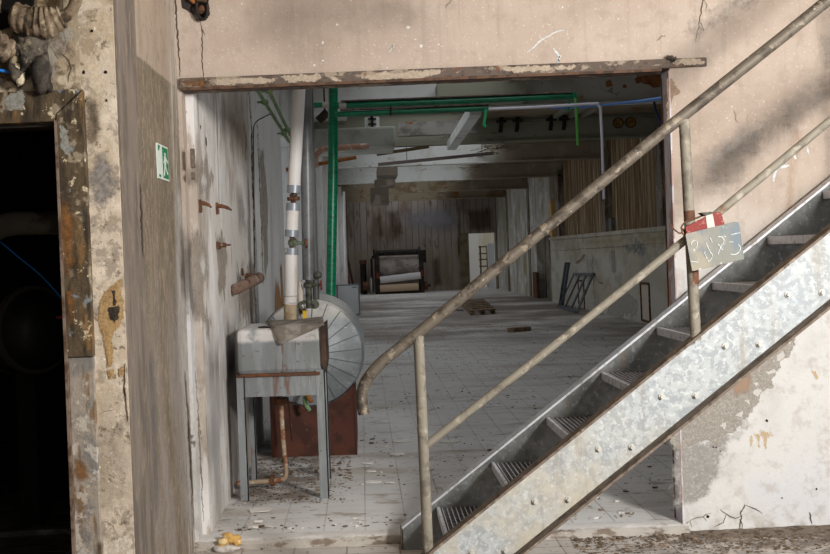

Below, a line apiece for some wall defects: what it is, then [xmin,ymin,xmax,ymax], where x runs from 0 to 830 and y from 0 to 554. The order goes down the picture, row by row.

spalling [98,279,128,422]
peeling [670,338,795,506]
crack [685,504,760,529]